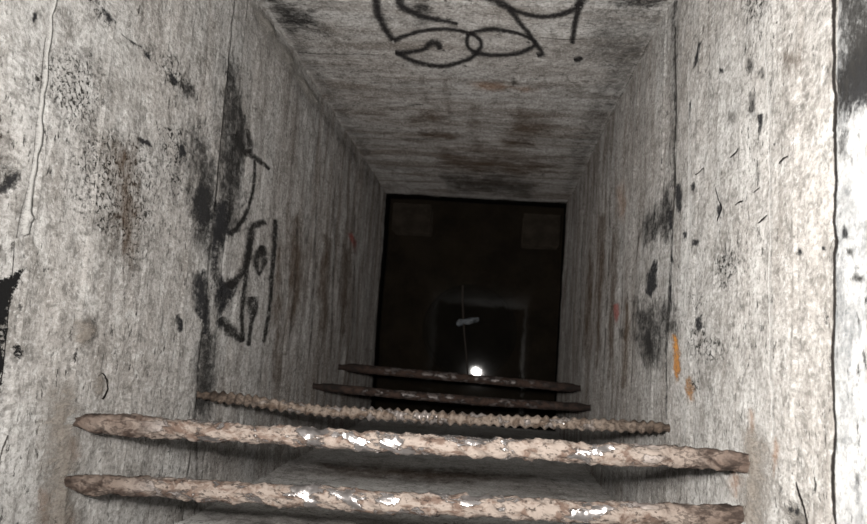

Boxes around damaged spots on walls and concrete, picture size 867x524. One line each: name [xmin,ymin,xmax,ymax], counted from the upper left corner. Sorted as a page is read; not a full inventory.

crack [1,244,14,380]
rust [672,334,694,401]
crack [829,0,840,524]